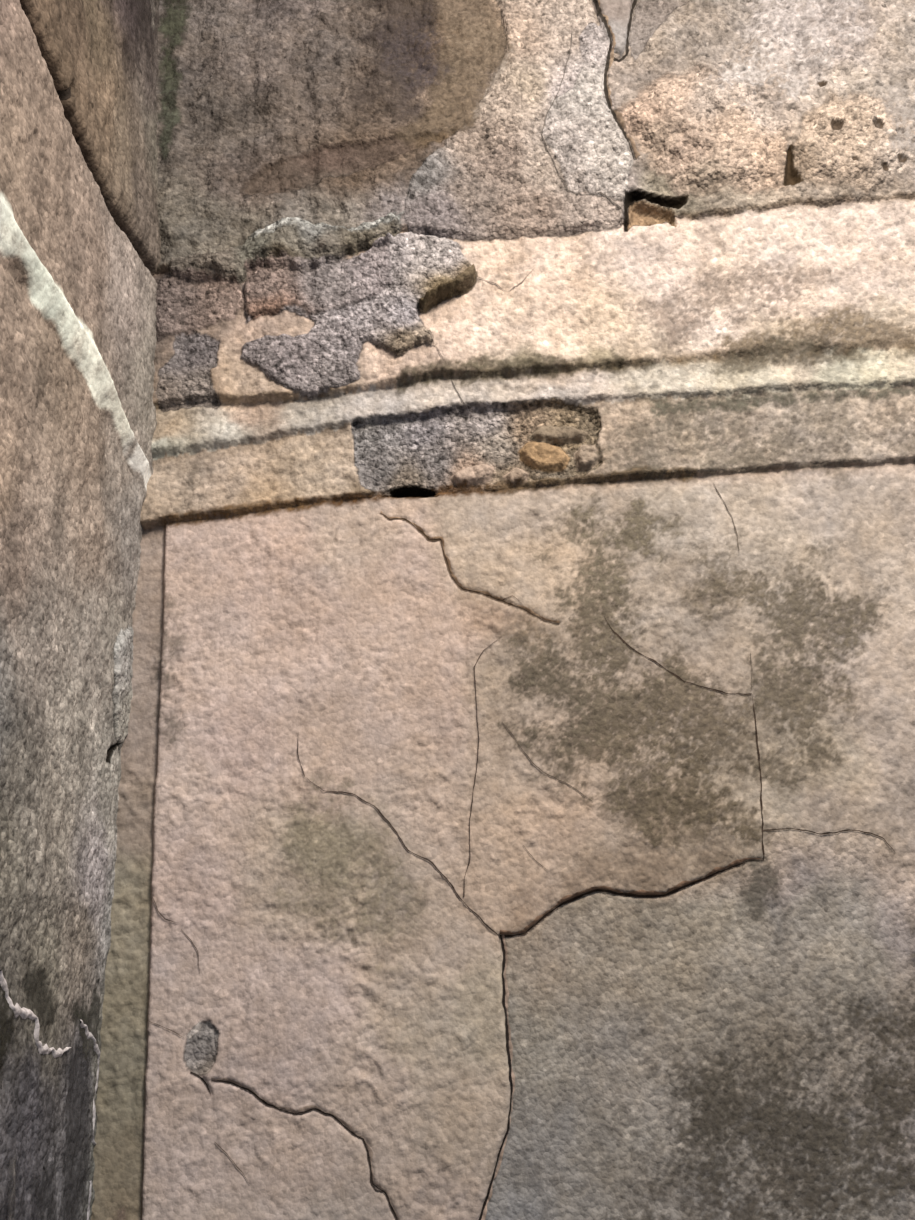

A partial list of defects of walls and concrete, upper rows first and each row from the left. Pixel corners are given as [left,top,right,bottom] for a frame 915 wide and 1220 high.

flaking render [155,0,690,412]
leakage [163,493,390,525]
crack [380,511,560,624]
flaking render [352,397,603,498]
leakage [436,446,697,496]
crack [713,483,739,548]
leakage [498,500,881,850]
crack [297,618,895,1220]
leakage [743,861,778,914]
crack [190,1072,400,1220]
leakage [650,997,915,1220]